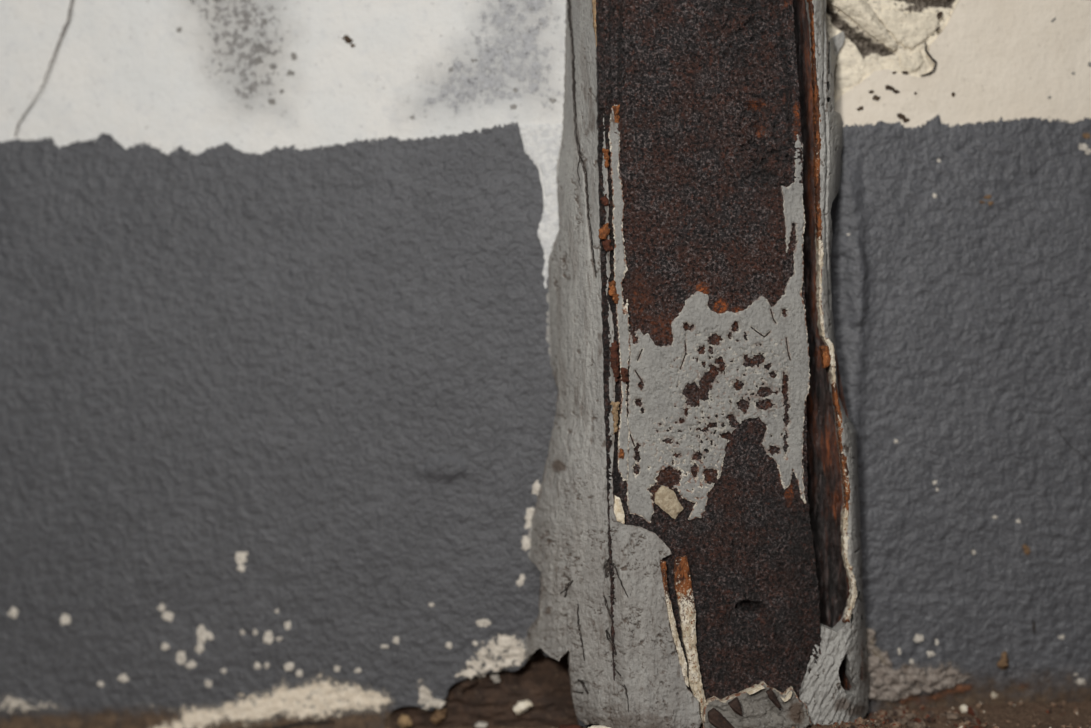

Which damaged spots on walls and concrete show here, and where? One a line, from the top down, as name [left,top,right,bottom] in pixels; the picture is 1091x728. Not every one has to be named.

crack [14,0,74,137]
water stain [191,0,297,109]
water stain [410,0,566,119]
peeling [520,123,563,288]
rust [598,223,614,252]
rust [608,280,619,304]
rust [609,340,629,382]
rust [819,345,831,368]
flaking render [807,0,958,623]
water stain [0,674,395,728]
flaking render [384,649,578,728]
peeling [660,555,706,724]